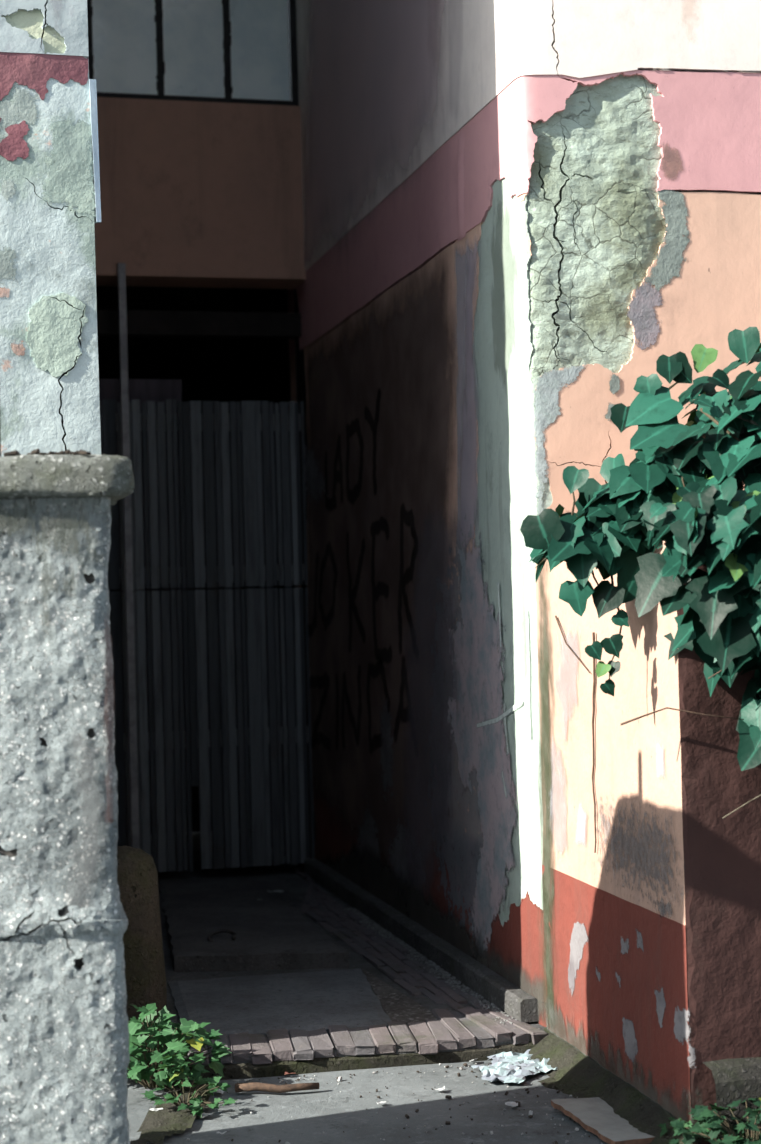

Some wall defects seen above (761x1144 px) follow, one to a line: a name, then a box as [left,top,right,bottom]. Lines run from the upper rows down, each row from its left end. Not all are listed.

peeling [1,9,66,54]
peeling [0,83,39,161]
peeling [0,247,16,298]
crack [538,148,605,352]
peeling [11,293,88,377]
crack [58,301,86,451]
peeling [447,74,690,952]
crack [1,911,82,940]